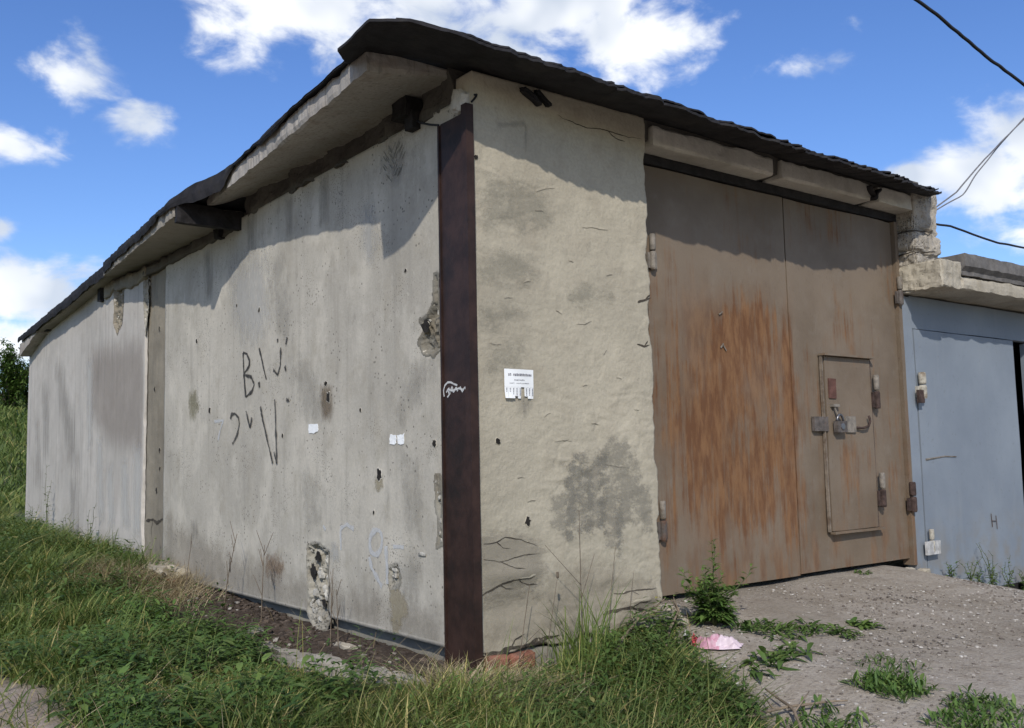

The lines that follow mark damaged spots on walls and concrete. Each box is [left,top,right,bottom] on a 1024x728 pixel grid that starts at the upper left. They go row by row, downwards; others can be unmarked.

crack [558,112,642,142]
spalling [113,289,124,335]
spalling [417,272,440,358]
rust [322,389,331,416]
spalling [306,541,331,631]
crack [482,534,540,596]